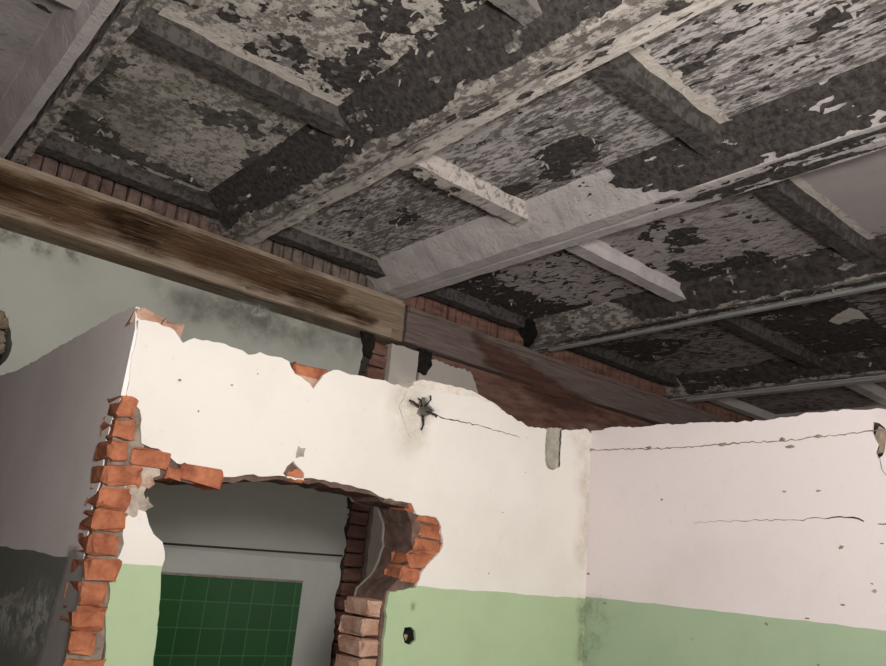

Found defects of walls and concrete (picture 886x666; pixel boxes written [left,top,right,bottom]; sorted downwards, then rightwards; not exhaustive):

peeling [54,0,622,260]
peeling [447,0,886,395]
spalling [409,395,437,430]
crack [436,414,516,436]
crack [590,429,886,451]
flaking render [282,469,306,484]
flaking render [37,395,224,666]
flaking render [340,497,354,581]
flaking render [382,498,442,583]
crack [693,516,886,525]
flaking render [334,596,382,666]
spalling [403,627,414,644]